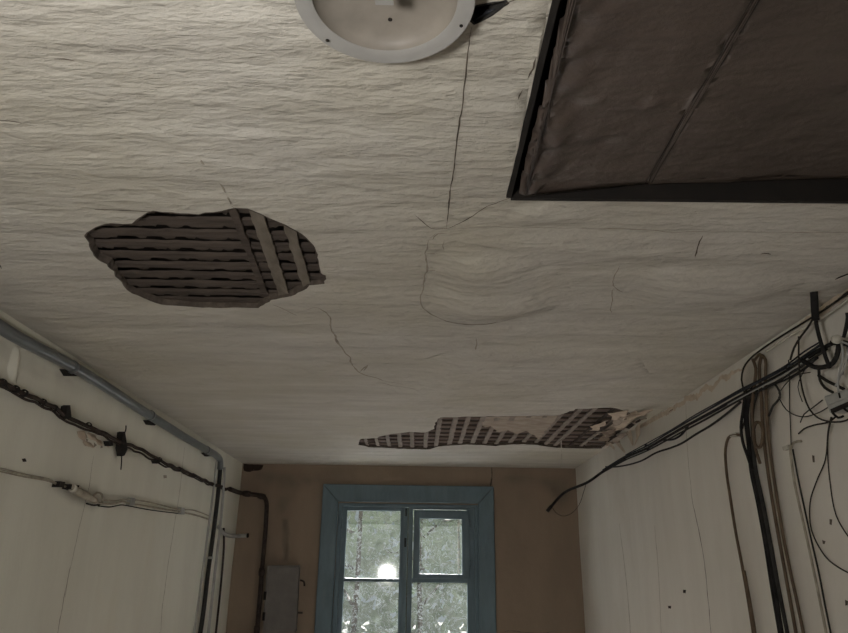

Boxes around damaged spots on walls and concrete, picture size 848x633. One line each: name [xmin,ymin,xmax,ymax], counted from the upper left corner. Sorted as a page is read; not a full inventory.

crack [416,28,514,350]
spalling [84,208,326,308]
crack [274,305,413,389]
spalling [358,408,673,467]